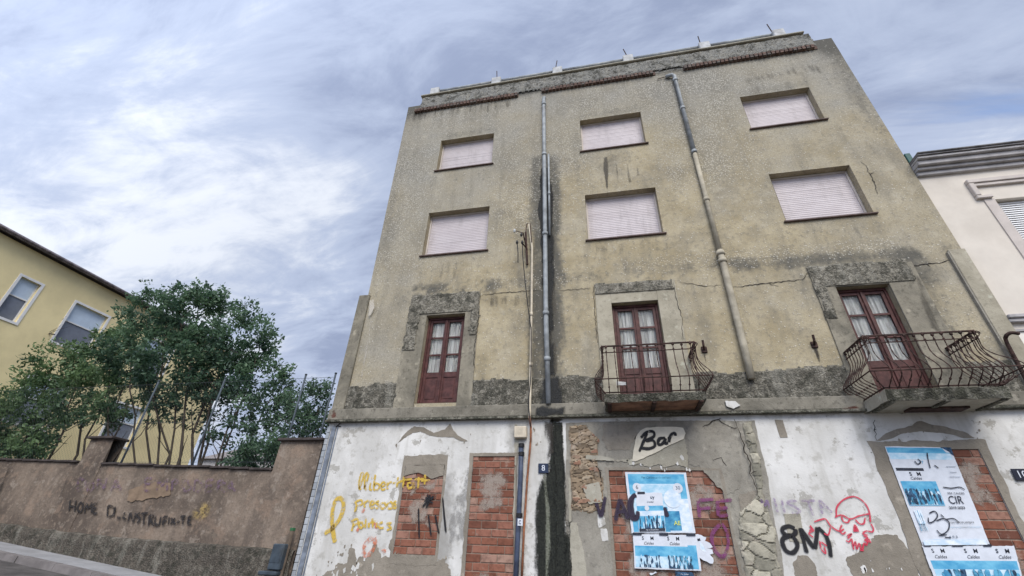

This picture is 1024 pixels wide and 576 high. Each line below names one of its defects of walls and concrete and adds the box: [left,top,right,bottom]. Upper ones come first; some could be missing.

crack [673,273,807,339]
leakage [535,167,572,576]
peeling [395,424,471,447]
peeling [868,421,981,447]
peeling [565,401,817,576]
peeling [316,534,451,576]
flaking render [846,534,919,576]